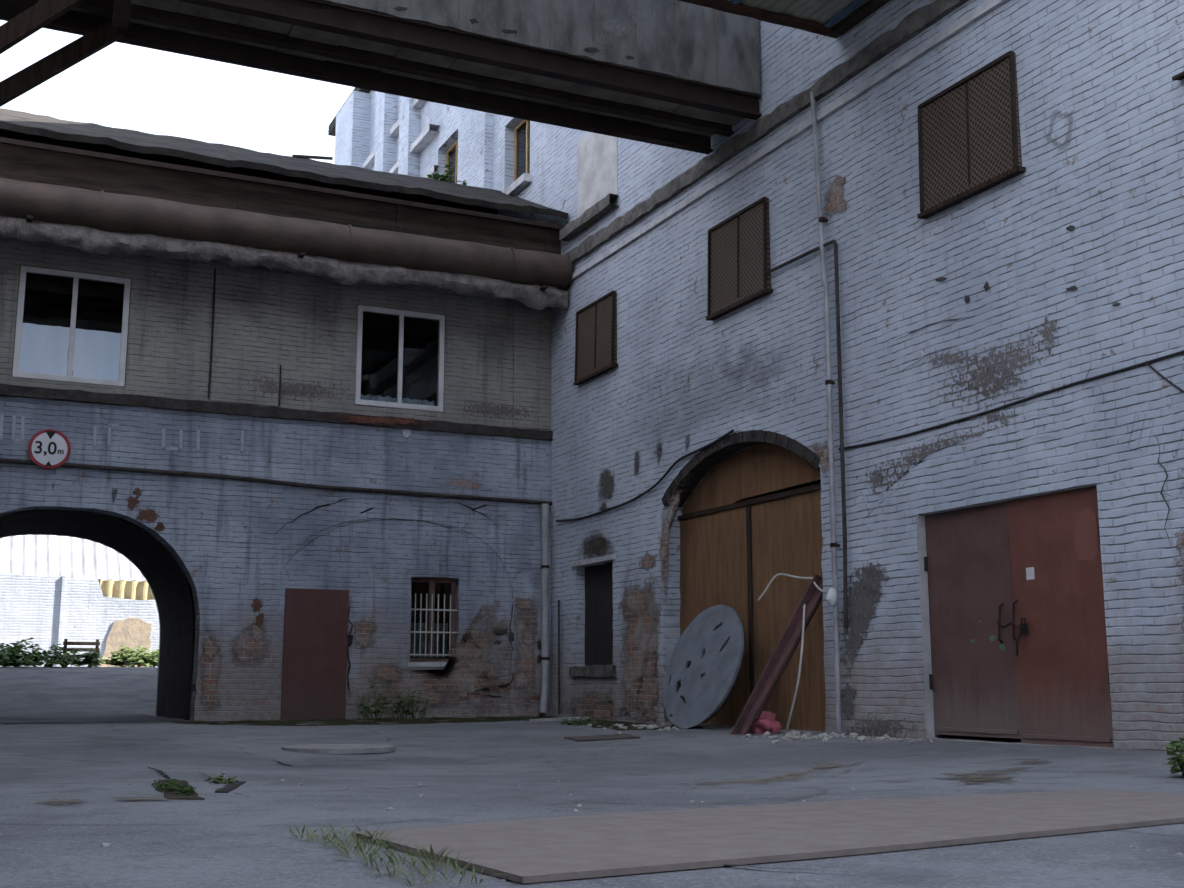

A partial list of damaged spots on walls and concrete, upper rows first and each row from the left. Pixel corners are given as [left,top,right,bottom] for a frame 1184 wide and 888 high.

flaking render [369,604,515,712]
flaking render [570,493,680,722]